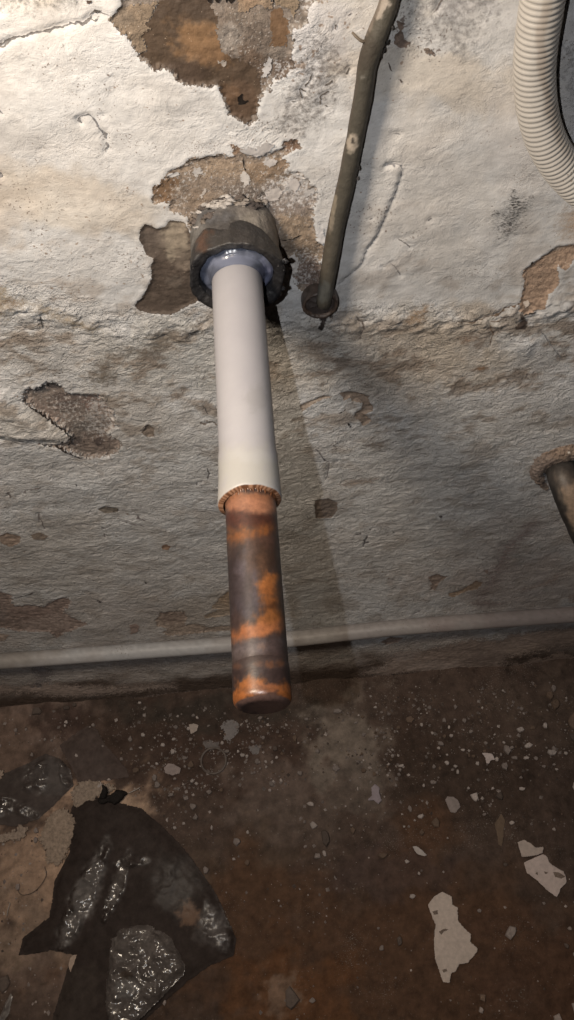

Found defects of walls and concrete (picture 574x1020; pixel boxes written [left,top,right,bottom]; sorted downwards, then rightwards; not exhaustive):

crack [0,10,109,48]
peeling [87,0,316,126]
peeling [135,139,326,315]
peeling [519,245,574,316]
flaking render [16,381,122,460]